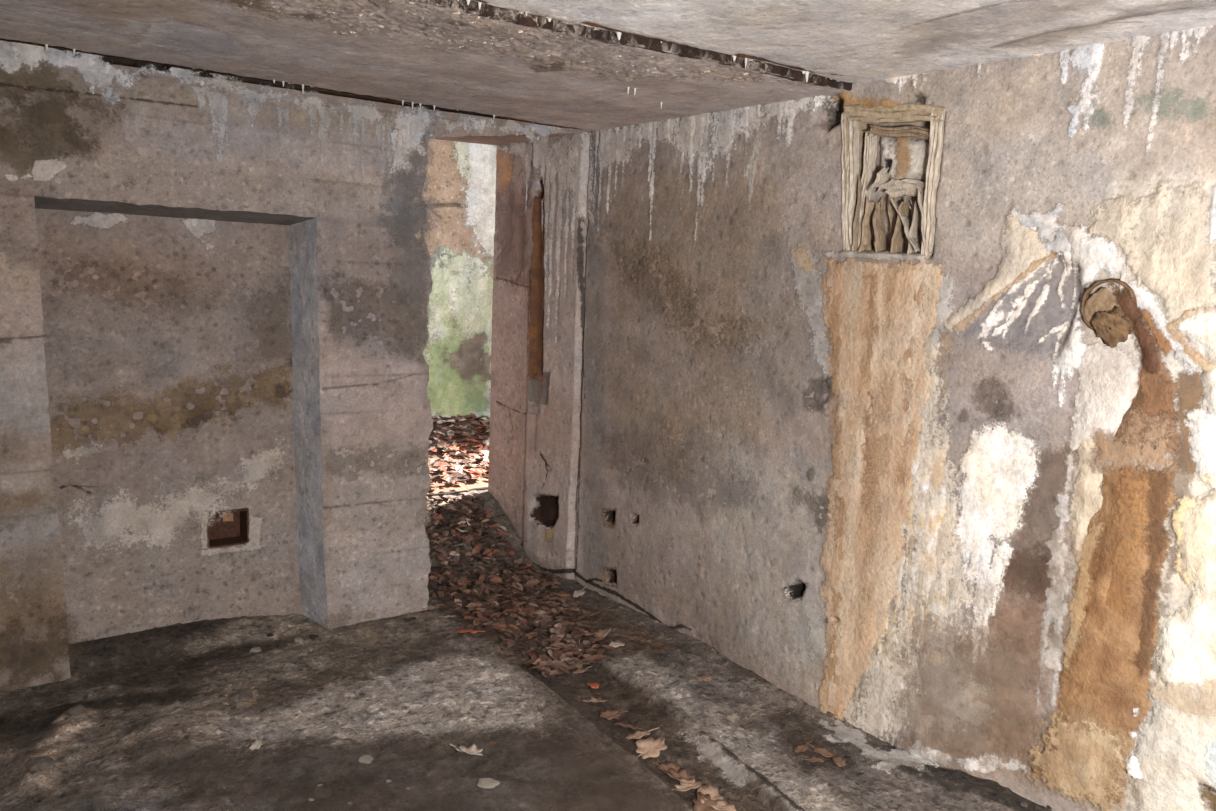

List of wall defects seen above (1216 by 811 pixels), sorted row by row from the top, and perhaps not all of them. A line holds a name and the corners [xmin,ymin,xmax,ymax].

water stain [881,73,927,93]
water stain [1059,43,1105,140]
water stain [1123,25,1214,155]
water stain [880,136,929,182]
water stain [0,41,836,420]
rust [527,191,545,457]
spalling [966,250,1083,360]
water stain [152,409,213,441]
water stain [787,180,1216,811]